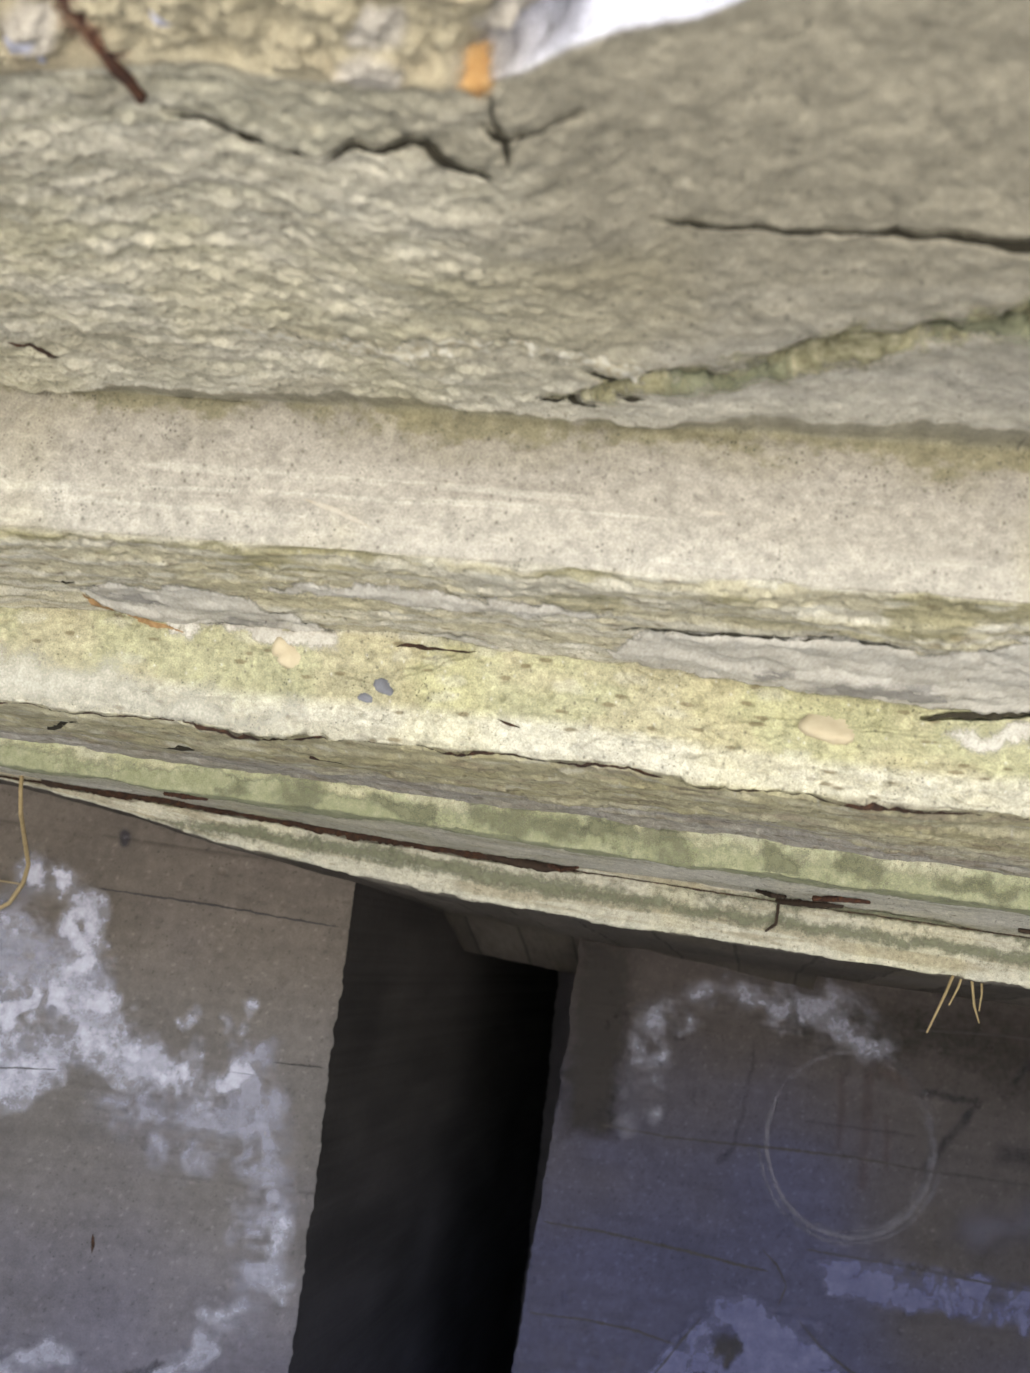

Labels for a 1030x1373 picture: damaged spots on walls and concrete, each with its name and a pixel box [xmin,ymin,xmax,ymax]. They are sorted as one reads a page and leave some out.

rust [53,0,127,58]
spalling [0,0,740,105]
rust [457,40,496,98]
crack [165,106,579,182]
crack [658,219,1030,254]
flaking render [226,617,301,669]
flaking render [357,678,394,703]
peeling [815,684,948,704]
water stain [739,985,1030,1084]
water stain [0,859,292,1360]
water stain [646,1294,846,1373]
water stain [814,1258,1030,1338]